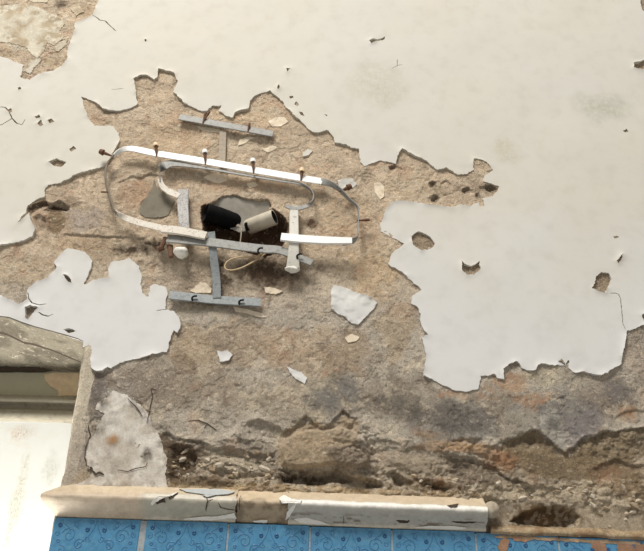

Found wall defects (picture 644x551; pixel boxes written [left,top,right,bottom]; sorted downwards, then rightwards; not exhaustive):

peeling [0,0,98,80]
peeling [0,71,644,487]
crack [128,388,156,420]
crack [84,425,104,475]
crack [205,496,241,511]
spalling [164,409,644,533]